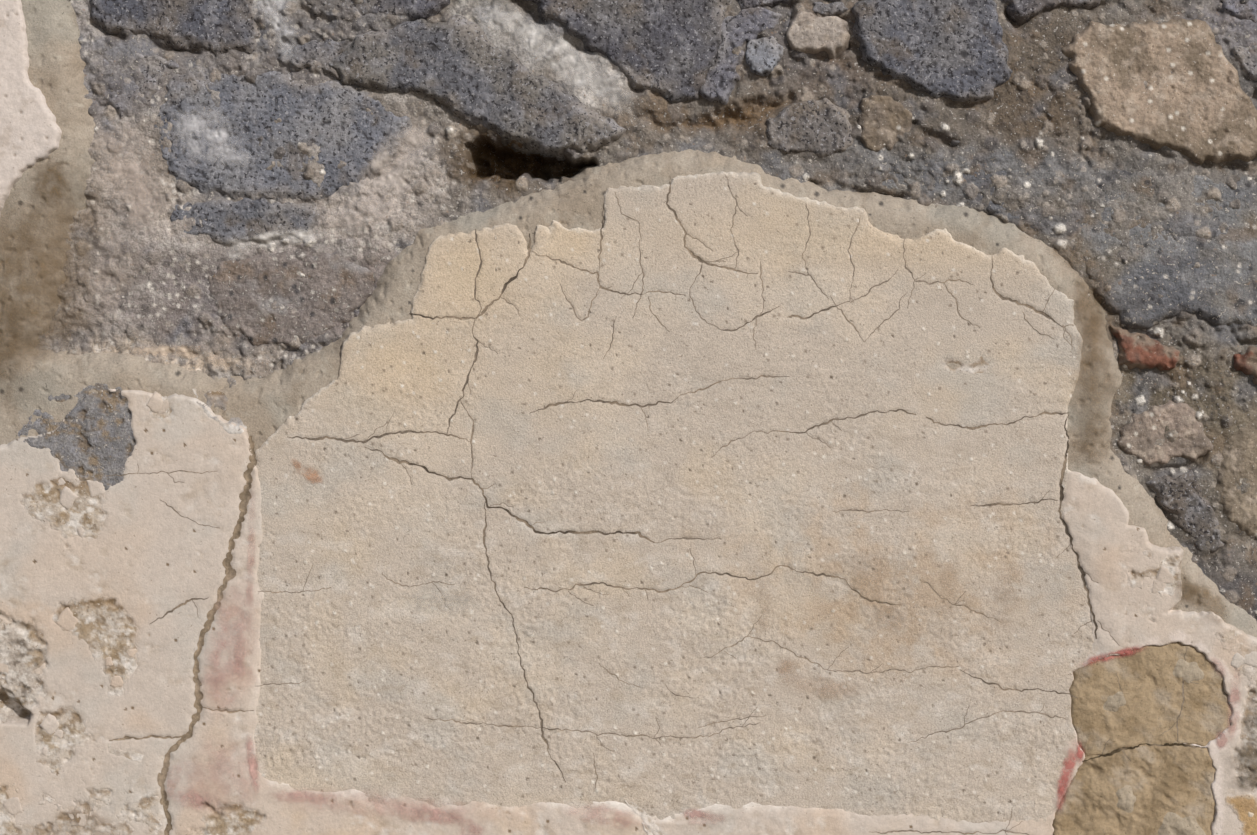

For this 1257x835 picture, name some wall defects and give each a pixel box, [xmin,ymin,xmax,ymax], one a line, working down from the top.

flaking render [16,383,136,548]
spalling [146,391,172,420]
crack [289,175,1077,788]
spalling [0,611,92,773]
spalling [52,595,139,698]
crack [106,435,331,835]
crack [711,409,1205,762]
spalling [1125,540,1182,621]
spalling [1052,642,1257,835]
crack [878,809,1029,835]